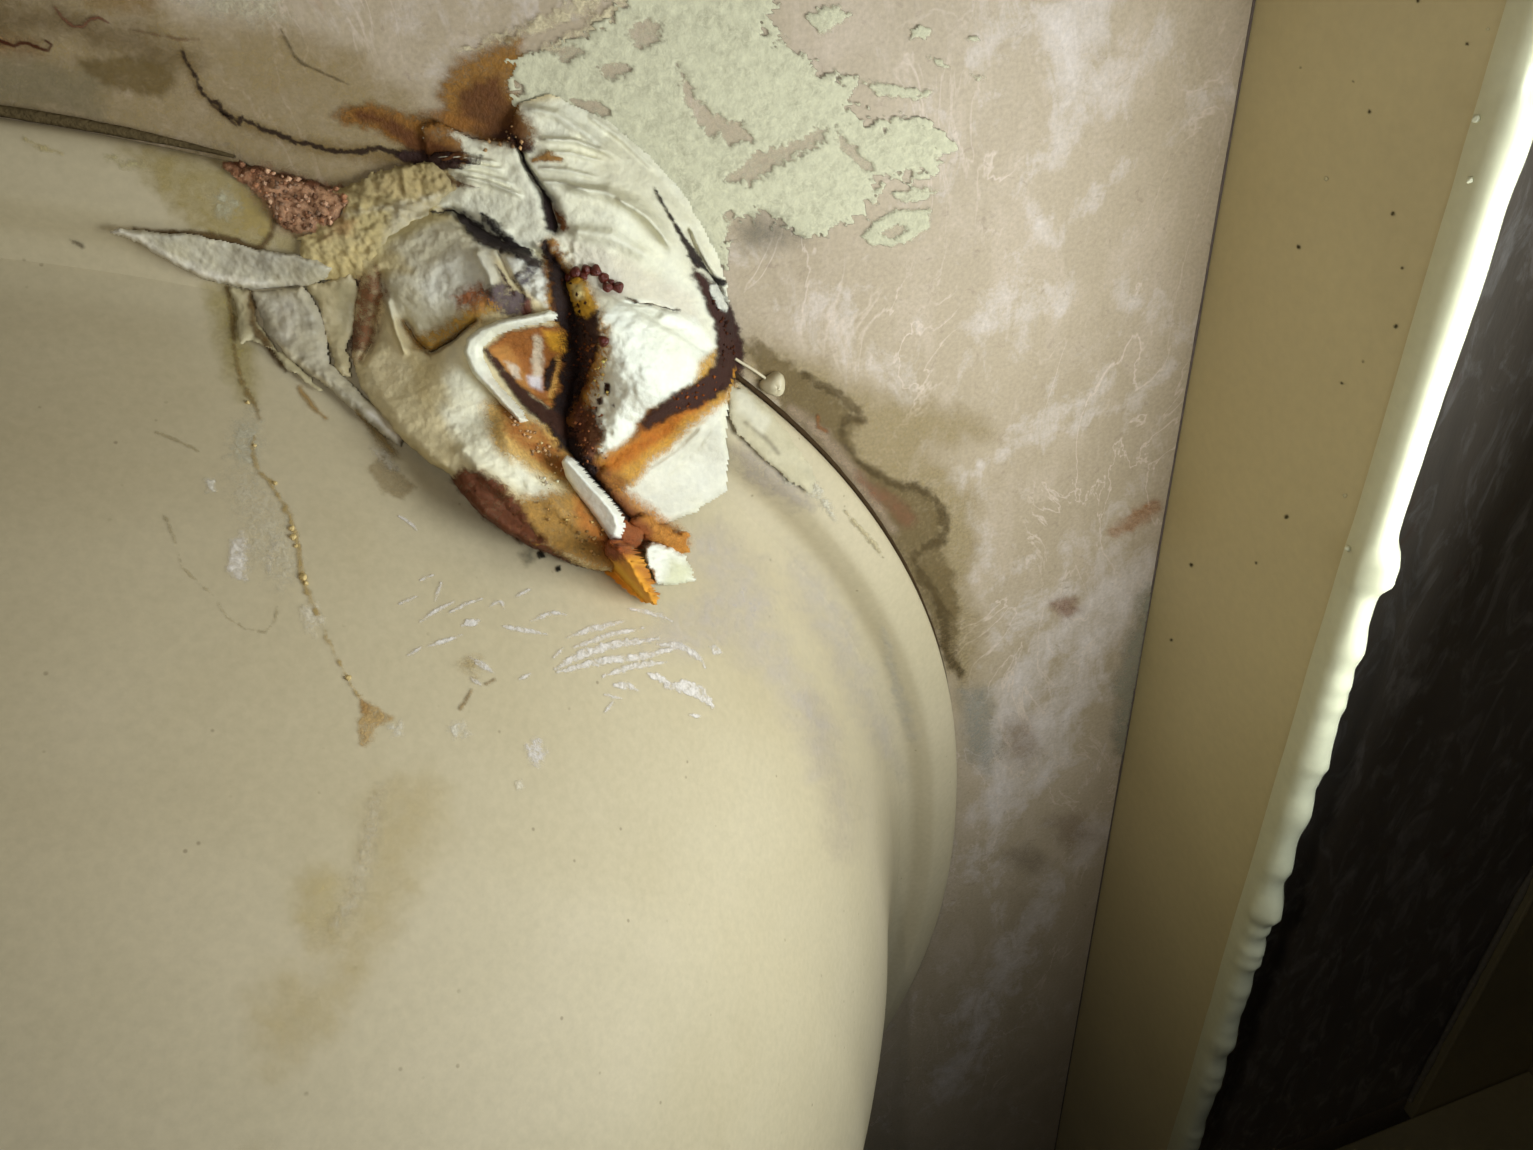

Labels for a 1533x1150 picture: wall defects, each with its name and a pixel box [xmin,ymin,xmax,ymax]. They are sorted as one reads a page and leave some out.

leakage [0,0,412,188]
crack [0,7,413,165]
corrosion [340,39,563,187]
peeling [806,5,853,34]
spalling [222,160,348,234]
peeling [862,186,937,247]
corrosion [347,272,387,359]
crack [226,287,394,696]
corrosion [406,265,744,569]
leakage [749,345,971,676]